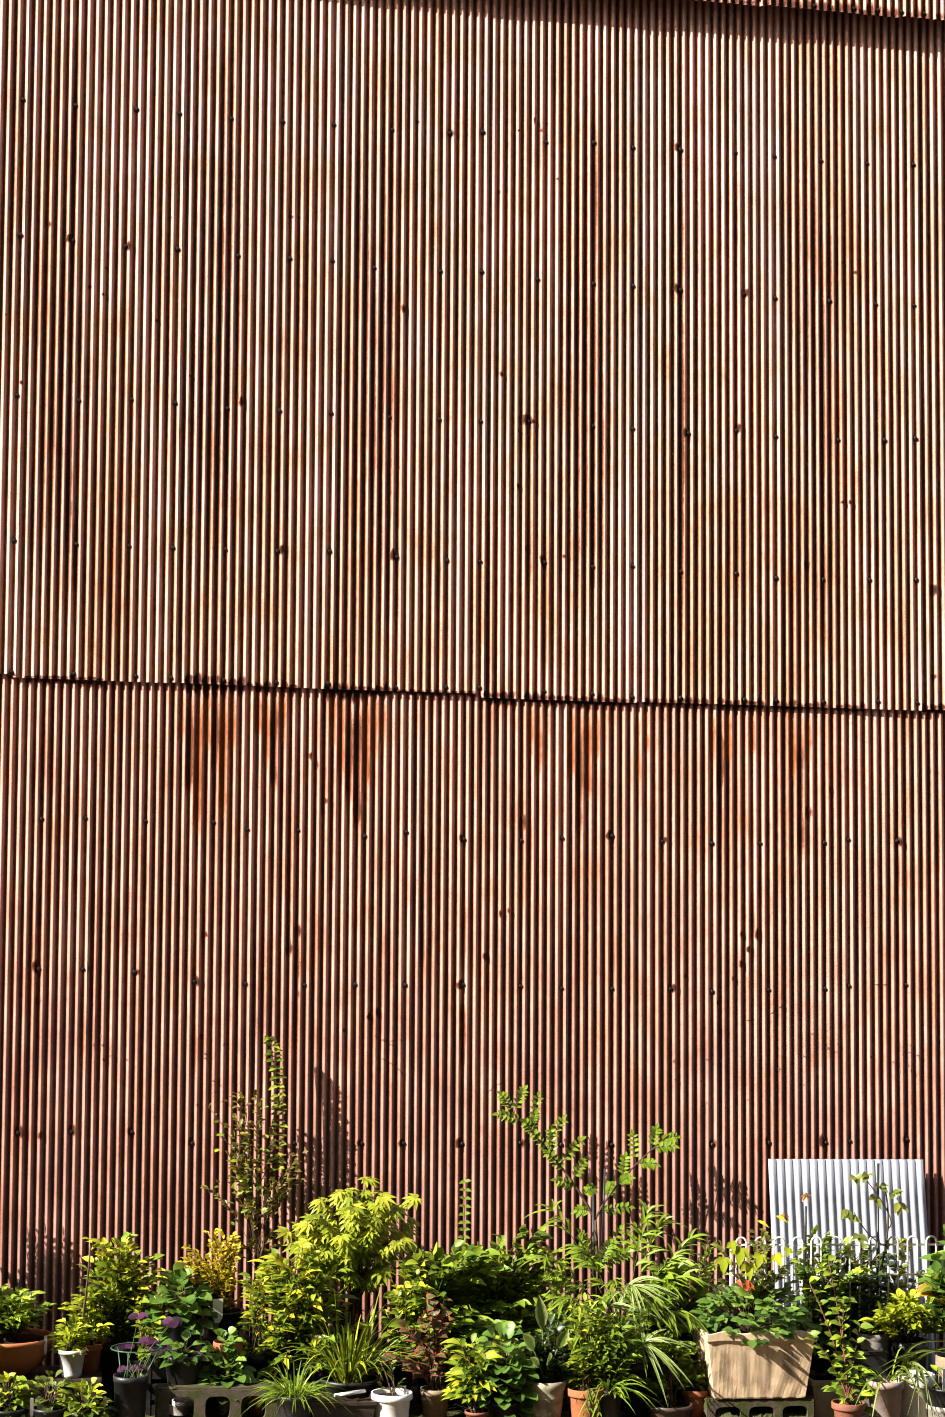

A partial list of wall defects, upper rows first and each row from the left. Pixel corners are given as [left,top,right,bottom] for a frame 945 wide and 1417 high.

rust [700,0,945,20]
rust [8,672,103,688]
rust [922,703,945,714]
rust [178,673,298,1079]